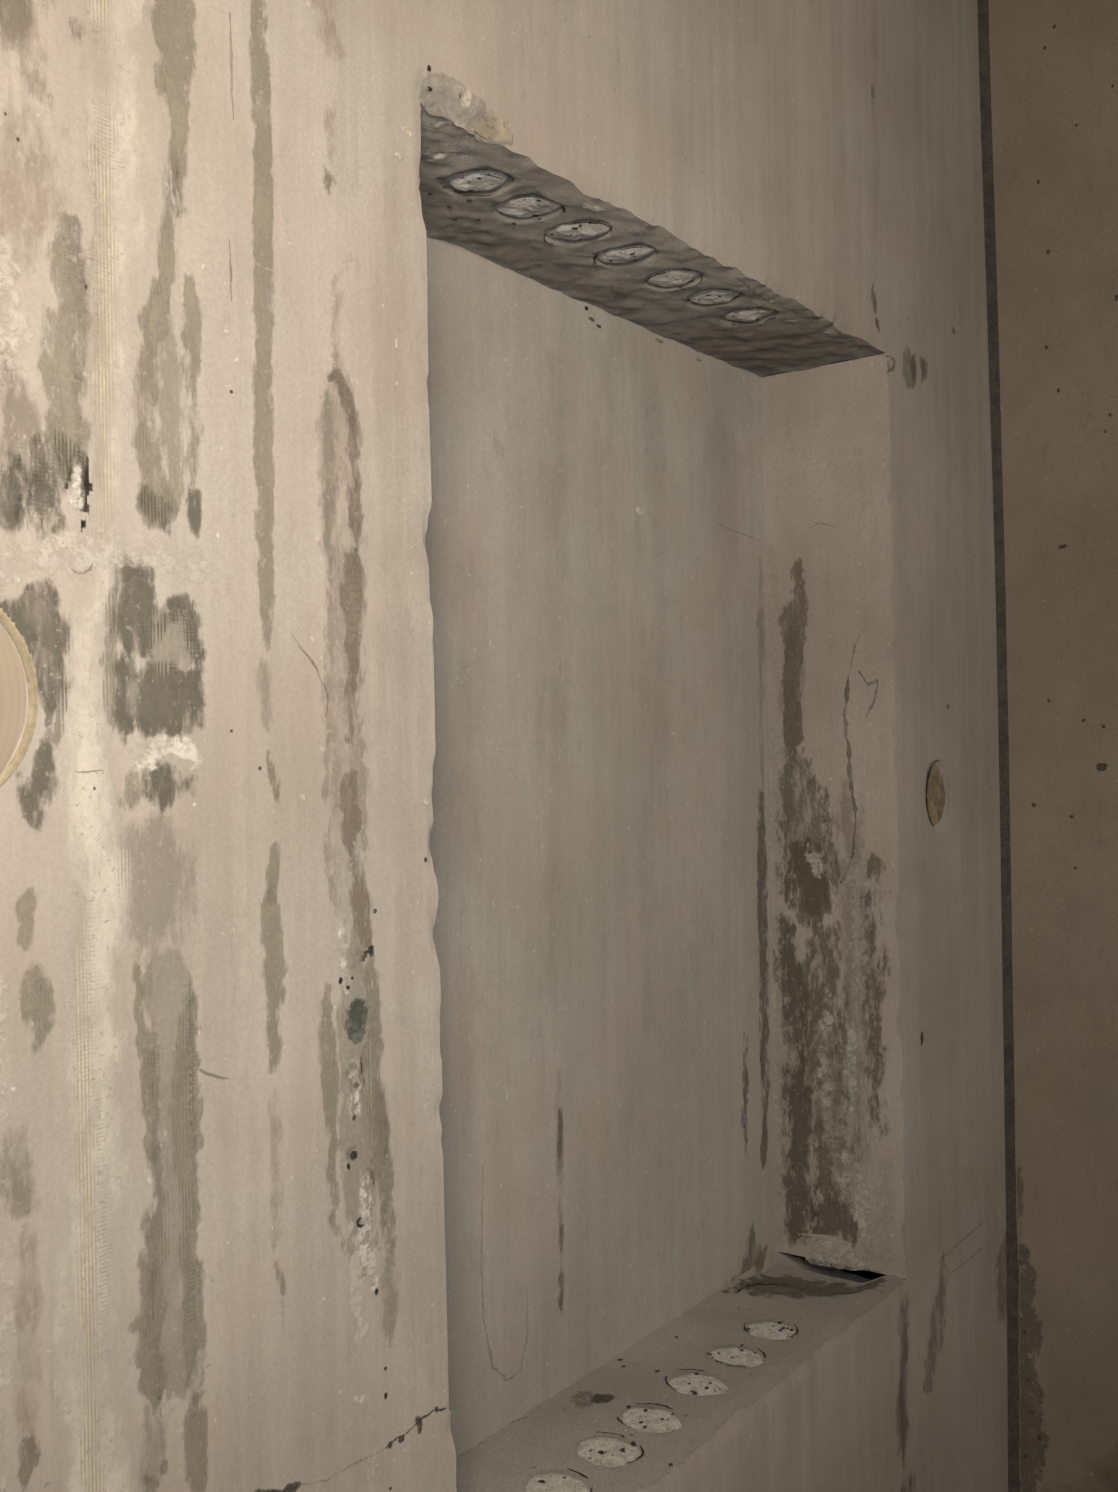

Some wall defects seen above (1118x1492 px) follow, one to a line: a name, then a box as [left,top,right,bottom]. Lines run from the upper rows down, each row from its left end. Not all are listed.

damp [732,551,894,1281]
crack [386,1406,446,1448]
crack [256,1482,300,1492]